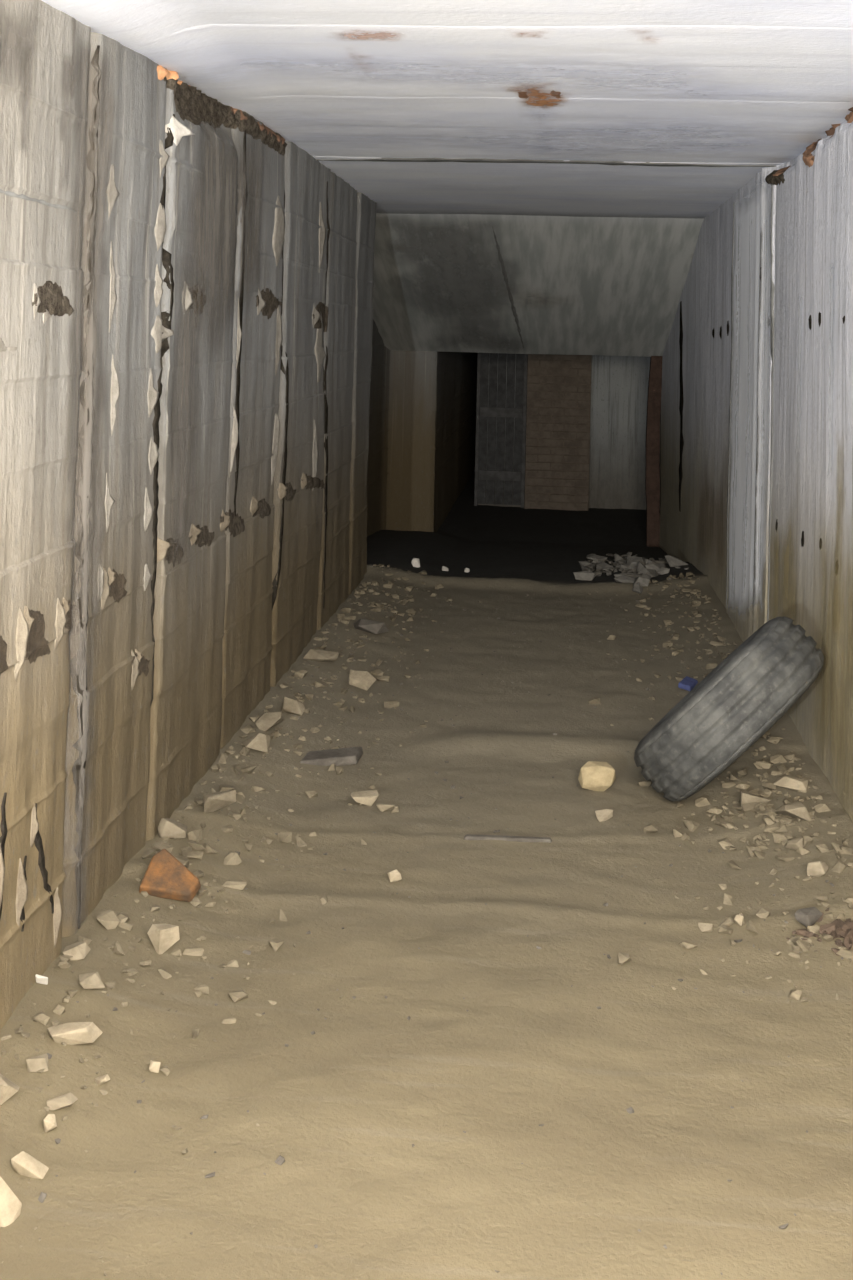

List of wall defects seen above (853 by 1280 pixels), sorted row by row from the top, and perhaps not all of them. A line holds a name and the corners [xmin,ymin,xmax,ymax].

spalling [157,65,288,156]
corrosion [513,87,563,108]
peeling [100,567,127,614]
peeling [0,597,72,681]